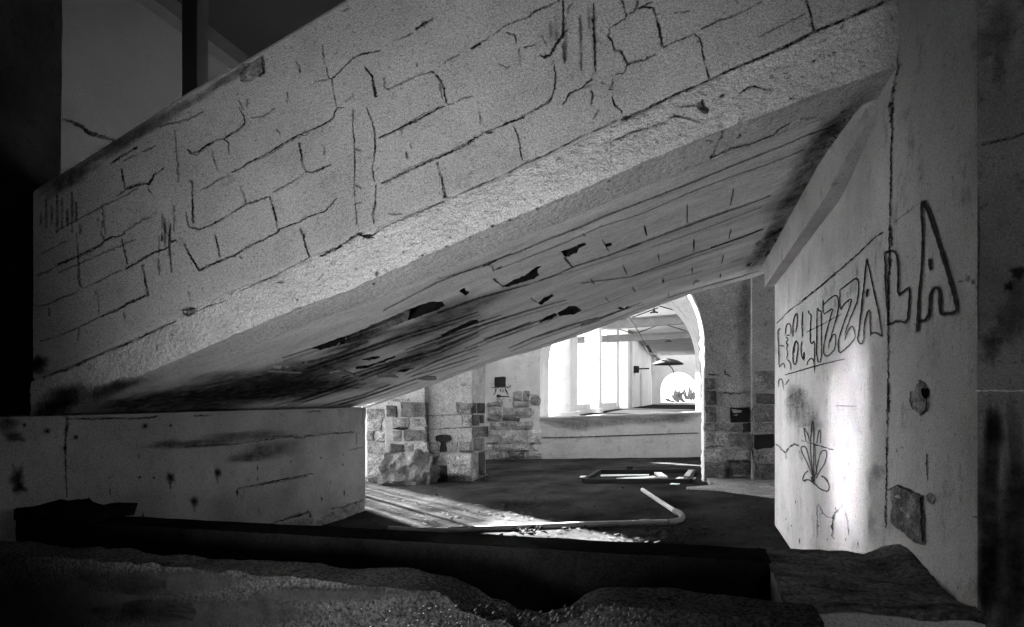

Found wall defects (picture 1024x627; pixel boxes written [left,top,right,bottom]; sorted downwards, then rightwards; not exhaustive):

spalling [239,56,265,82]
crack [57,0,808,317]
water stain [35,333,379,416]
spalling [268,301,445,380]
water stain [371,300,490,373]
spalling [503,266,541,287]
spalling [538,294,581,323]
spalling [561,243,586,257]
crack [777,62,909,528]
spalling [909,380,930,416]
peeling [888,485,937,545]
water stain [973,413,1024,627]